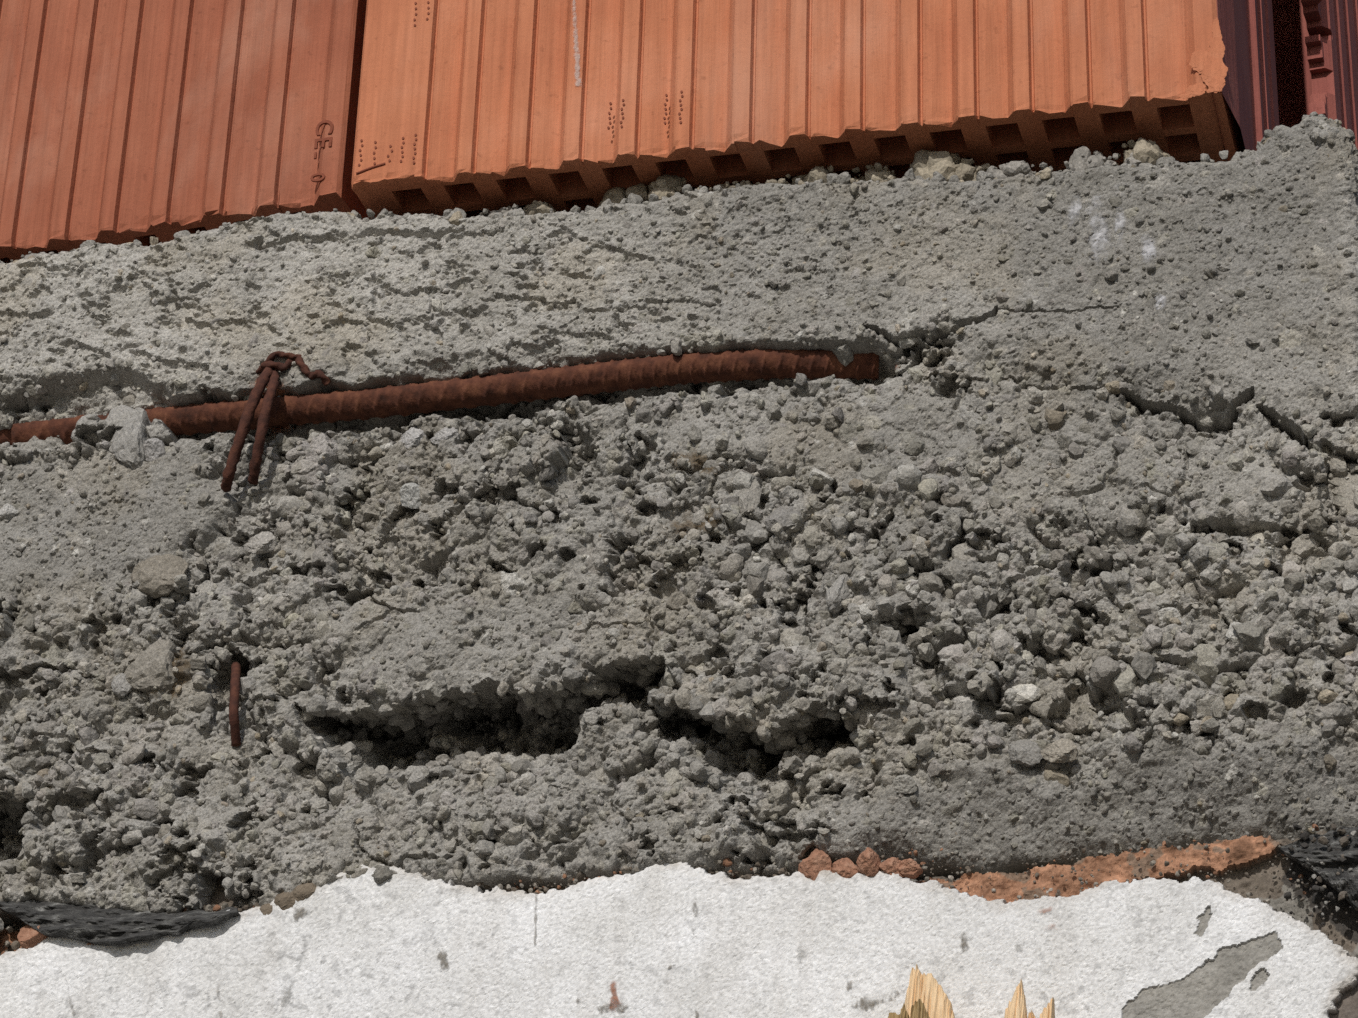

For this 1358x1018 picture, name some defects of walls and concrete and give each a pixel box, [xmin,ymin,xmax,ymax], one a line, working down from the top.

crack [863,305,1121,352]
spalling [279,337,896,397]
spalling [0,378,821,456]
crack [1002,375,1321,493]
crack [1201,514,1285,541]